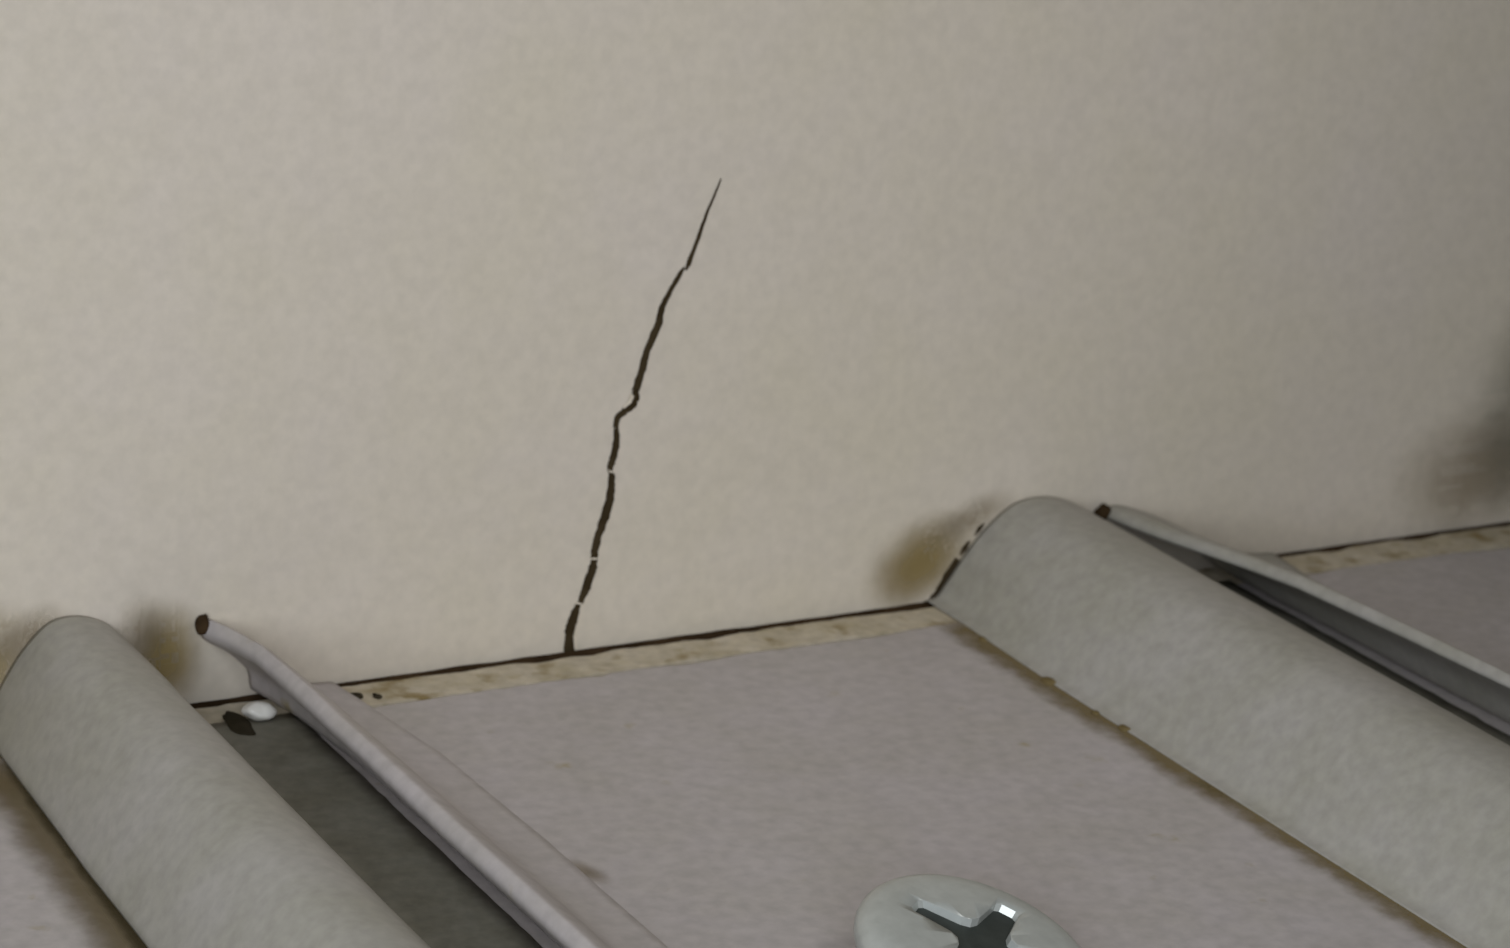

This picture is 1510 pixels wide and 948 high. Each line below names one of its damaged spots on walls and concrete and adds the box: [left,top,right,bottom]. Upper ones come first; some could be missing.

crack [563,178,722,652]
spalling [1094,503,1111,520]
spalling [195,614,209,635]
peeling [222,701,277,736]